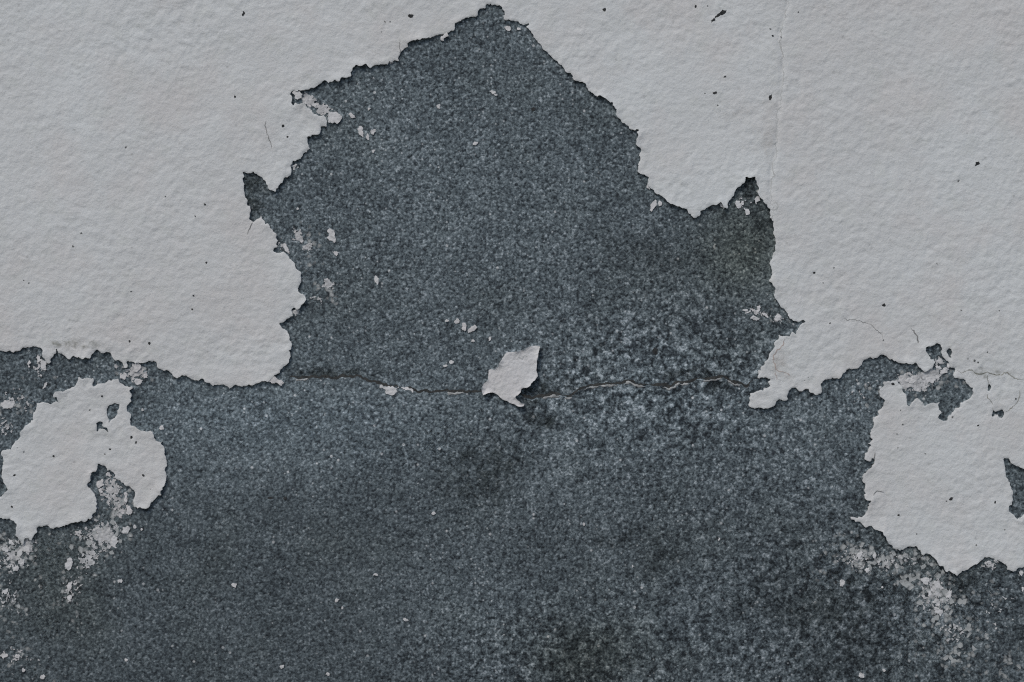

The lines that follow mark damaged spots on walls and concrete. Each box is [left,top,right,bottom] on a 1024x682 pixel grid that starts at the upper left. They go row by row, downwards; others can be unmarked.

crack [290,374,481,395]
peeling [0,343,1024,682]
peeling [243,4,805,397]
crack [521,339,789,400]